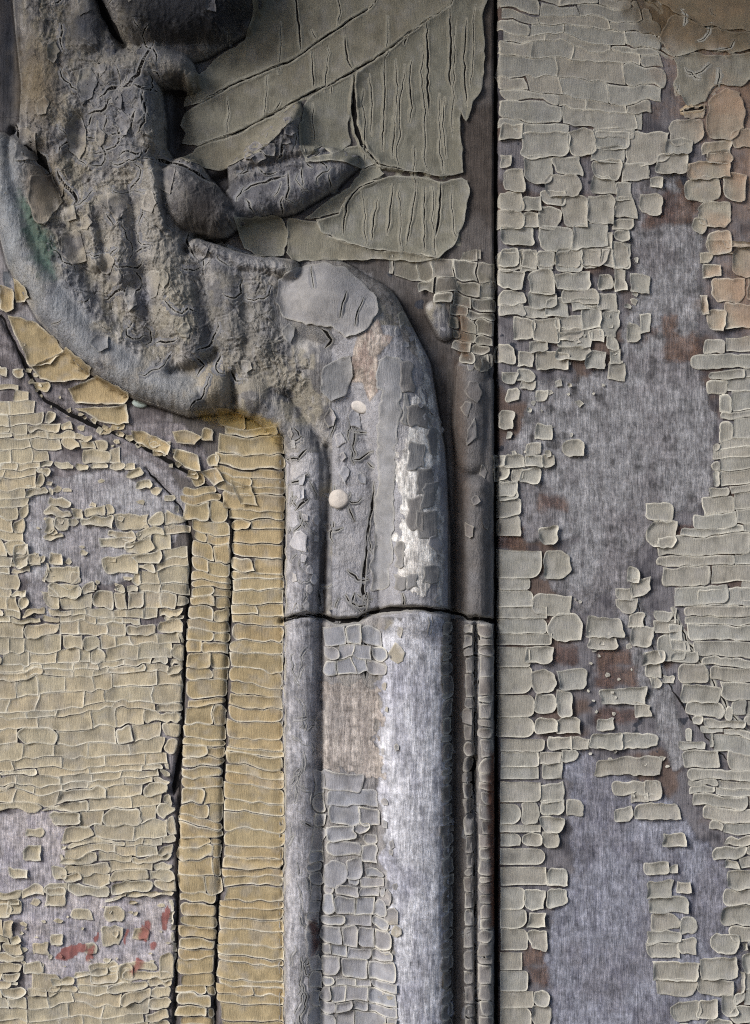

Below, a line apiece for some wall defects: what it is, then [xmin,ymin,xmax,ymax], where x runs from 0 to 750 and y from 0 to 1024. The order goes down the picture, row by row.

peeling [14,127,38,160]
peeling [28,174,114,274]
peeling [66,62,106,159]
peeling [110,90,131,135]
peeling [141,165,176,213]
peeling [123,269,168,311]
crack [0,0,498,1024]
peeling [180,0,750,1024]
peeling [0,278,455,1024]